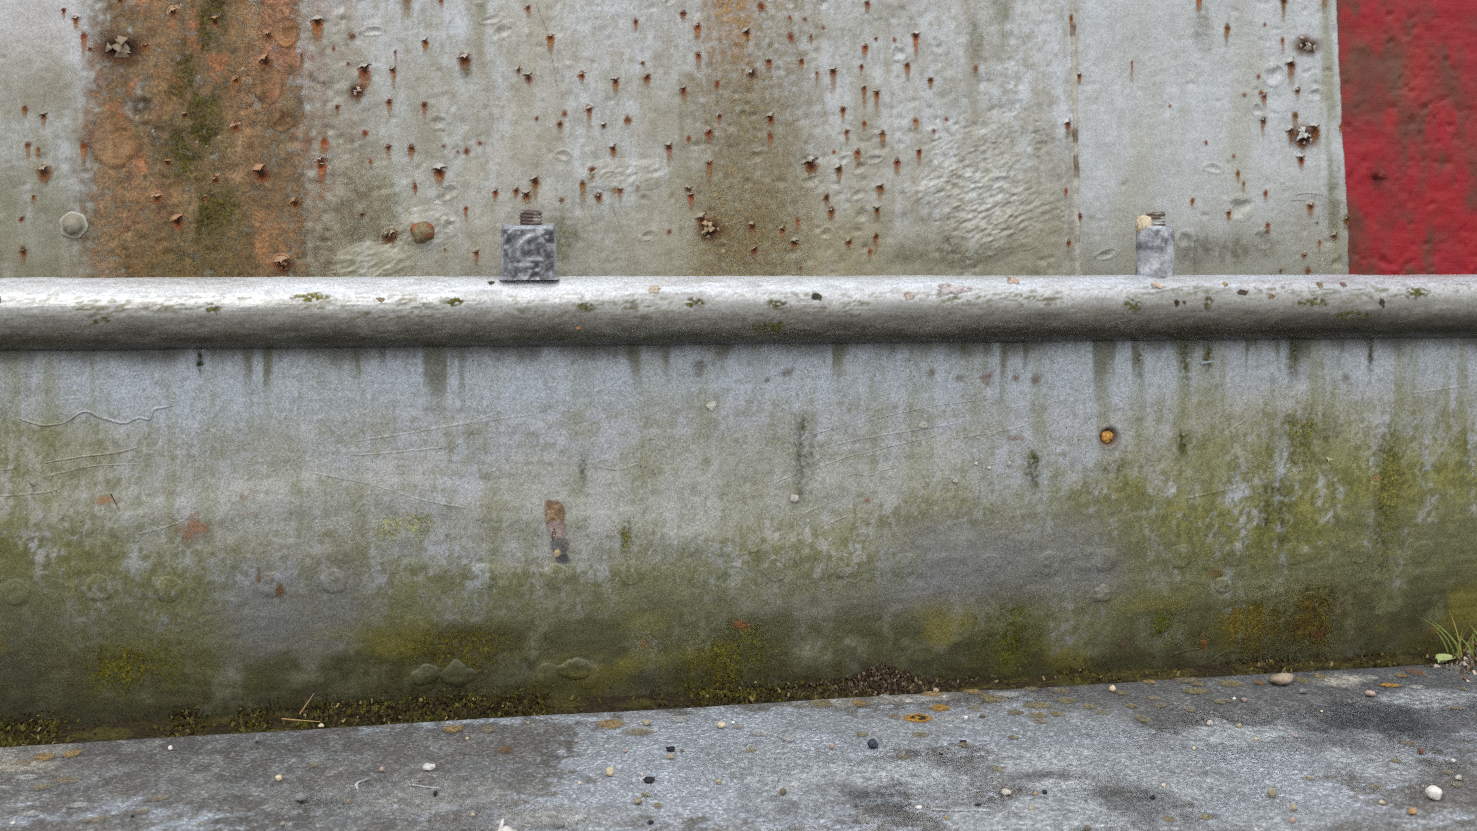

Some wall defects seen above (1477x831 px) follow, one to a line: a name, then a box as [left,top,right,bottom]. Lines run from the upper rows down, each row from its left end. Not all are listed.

corrosion [79,0,328,278]
corrosion [696,0,797,276]